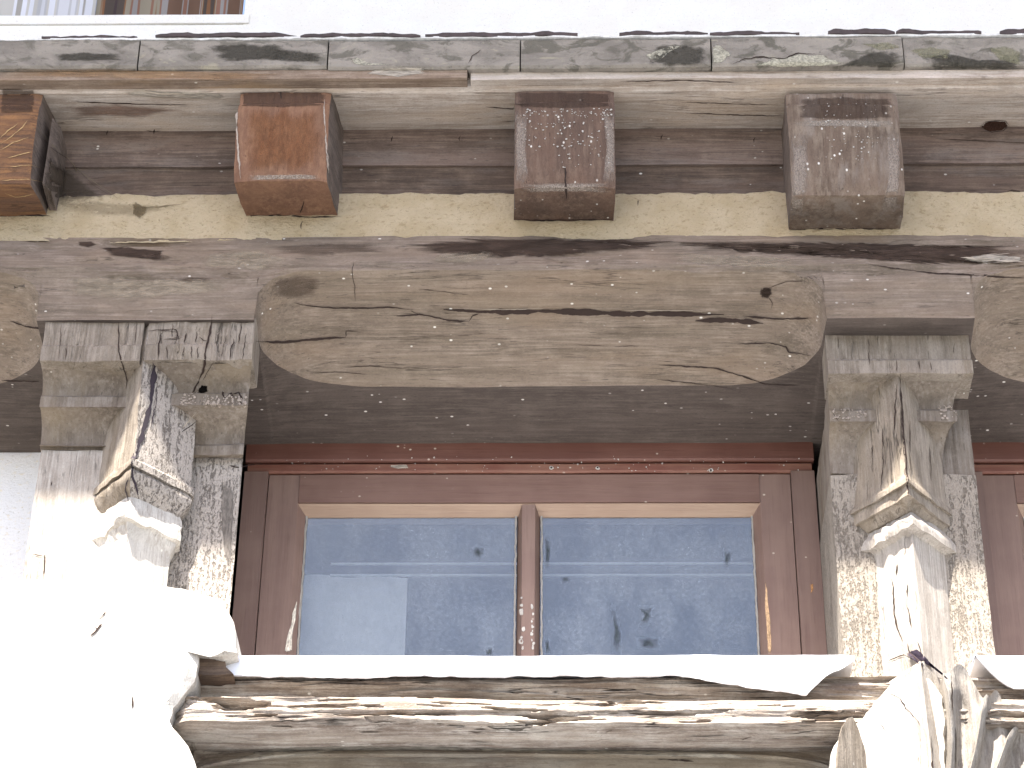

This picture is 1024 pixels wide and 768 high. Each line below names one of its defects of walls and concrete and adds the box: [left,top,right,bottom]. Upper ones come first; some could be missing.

leakage [654,46,703,66]
leakage [842,52,895,67]
leakage [930,55,1015,69]
leakage [79,242,162,259]
leakage [420,238,669,257]
leakage [682,242,1013,265]
crack [118,263,811,499]
crack [871,344,955,494]